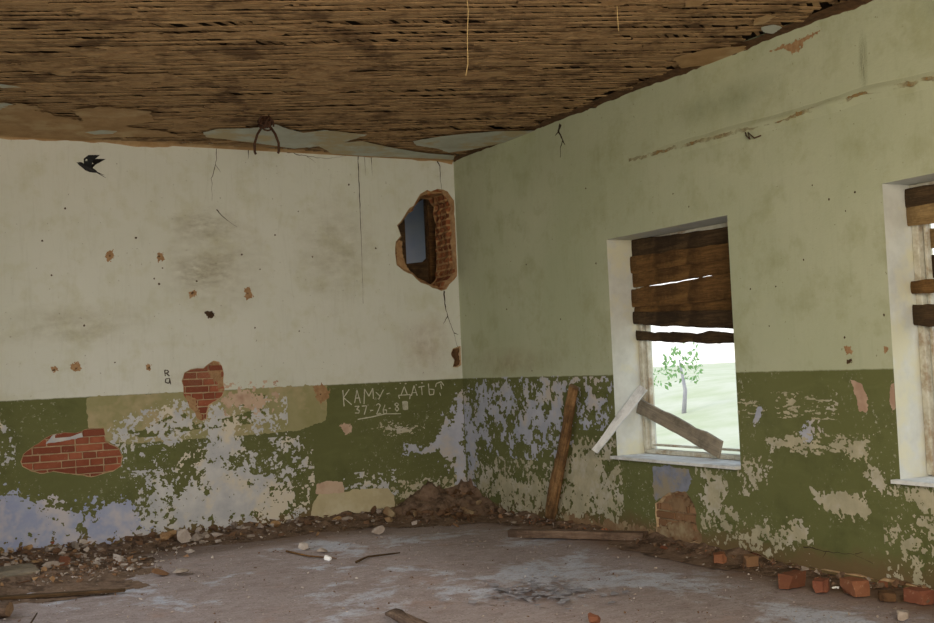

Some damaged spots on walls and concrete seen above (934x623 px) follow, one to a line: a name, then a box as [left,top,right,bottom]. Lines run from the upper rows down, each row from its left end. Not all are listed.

flaking render [731,0,873,55]
flaking render [0,135,497,164]
flaking render [518,66,701,131]
spalling [395,189,457,291]
peeling [0,361,315,552]
peeling [343,375,934,590]